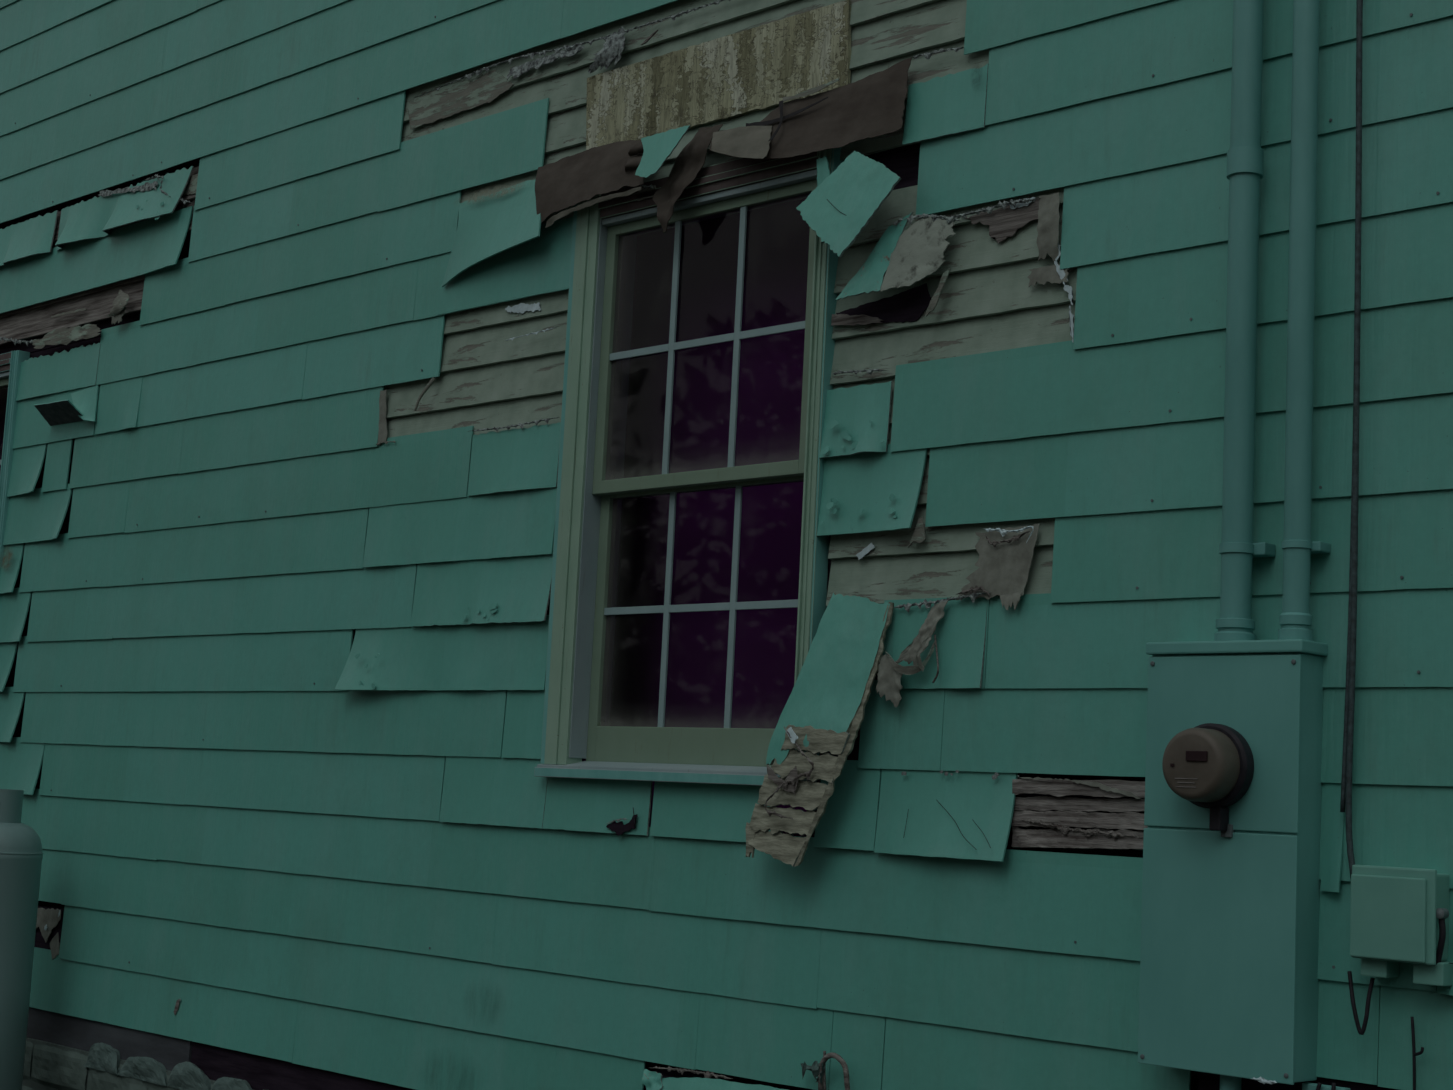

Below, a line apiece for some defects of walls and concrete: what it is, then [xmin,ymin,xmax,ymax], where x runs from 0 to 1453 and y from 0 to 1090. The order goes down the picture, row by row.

peeling [401,0,989,203]
peeling [0,275,145,349]
peeling [376,289,569,445]
peeling [830,185,1077,444]
peeling [826,448,1055,613]